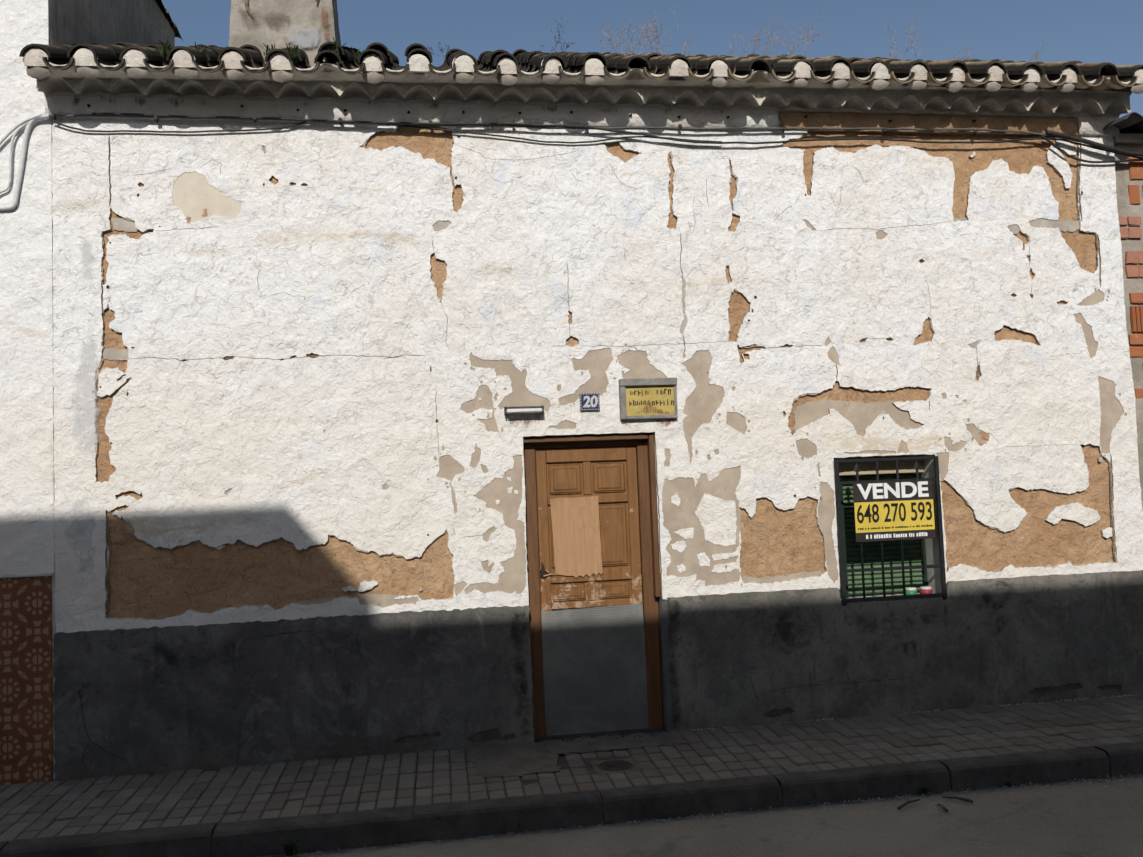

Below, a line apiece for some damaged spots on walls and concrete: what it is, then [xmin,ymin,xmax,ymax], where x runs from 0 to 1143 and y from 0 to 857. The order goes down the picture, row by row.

flaking render [360,125,463,231]
flaking render [781,131,1098,278]
flaking render [94,208,154,482]
crack [147,305,449,362]
flaking render [105,444,528,621]
peeling [460,312,667,432]
peeling [682,350,750,463]
peeling [662,381,966,586]
flaking render [936,376,1127,572]